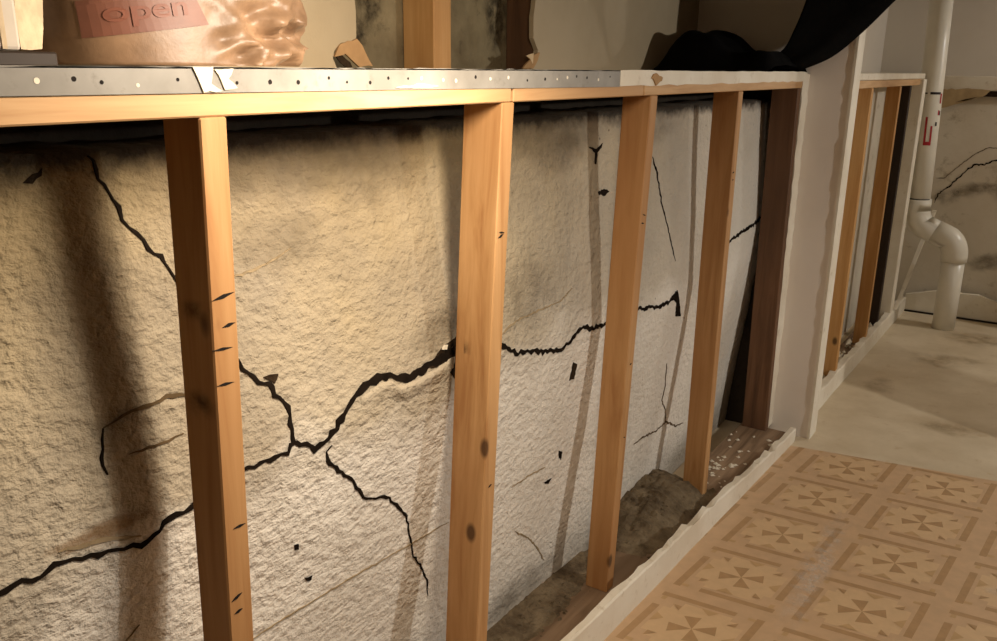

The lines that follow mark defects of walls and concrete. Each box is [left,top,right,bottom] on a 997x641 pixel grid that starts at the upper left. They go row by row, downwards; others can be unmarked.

crack [87,155,176,282]
crack [652,157,676,261]
crack [729,216,761,243]
crack [934,147,997,203]
crack [501,288,606,356]
crack [638,295,678,311]
crack [100,393,185,475]
crack [633,364,682,445]
crack [239,345,456,639]
crack [512,467,545,487]
crack [0,502,194,597]
crack [515,531,544,560]